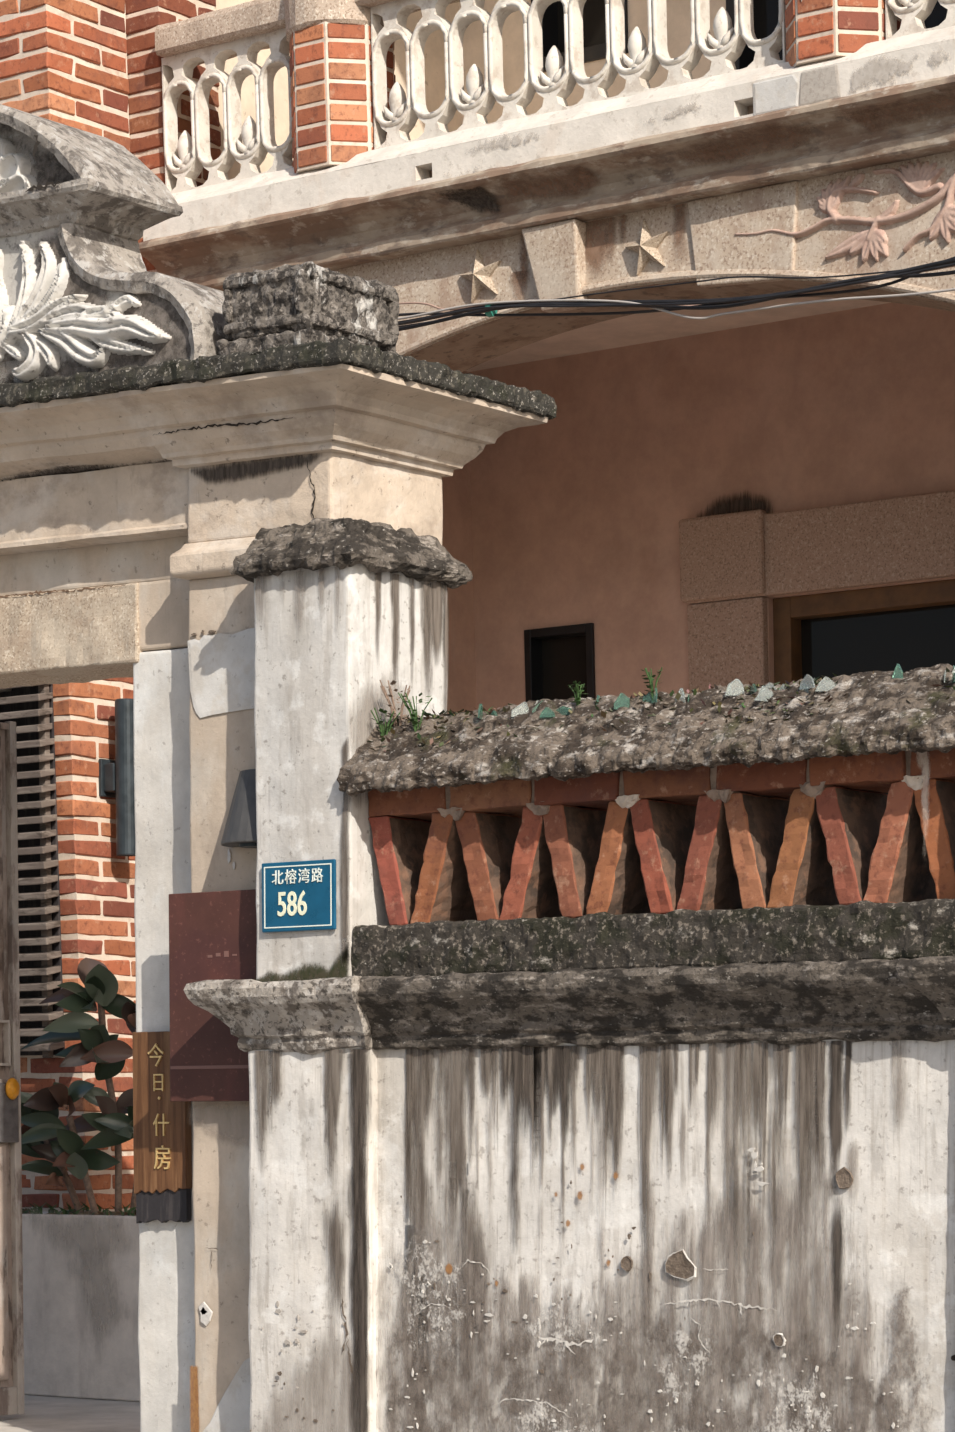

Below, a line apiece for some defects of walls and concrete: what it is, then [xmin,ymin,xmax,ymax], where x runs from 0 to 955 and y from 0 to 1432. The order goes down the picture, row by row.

crack [307,462,316,518]
damp [296,566,339,617]
damp [342,572,449,766]
damp [340,792,350,961]
damp [266,1040,929,1432]
spalling [608,1249,633,1272]
spalling [649,1249,697,1281]